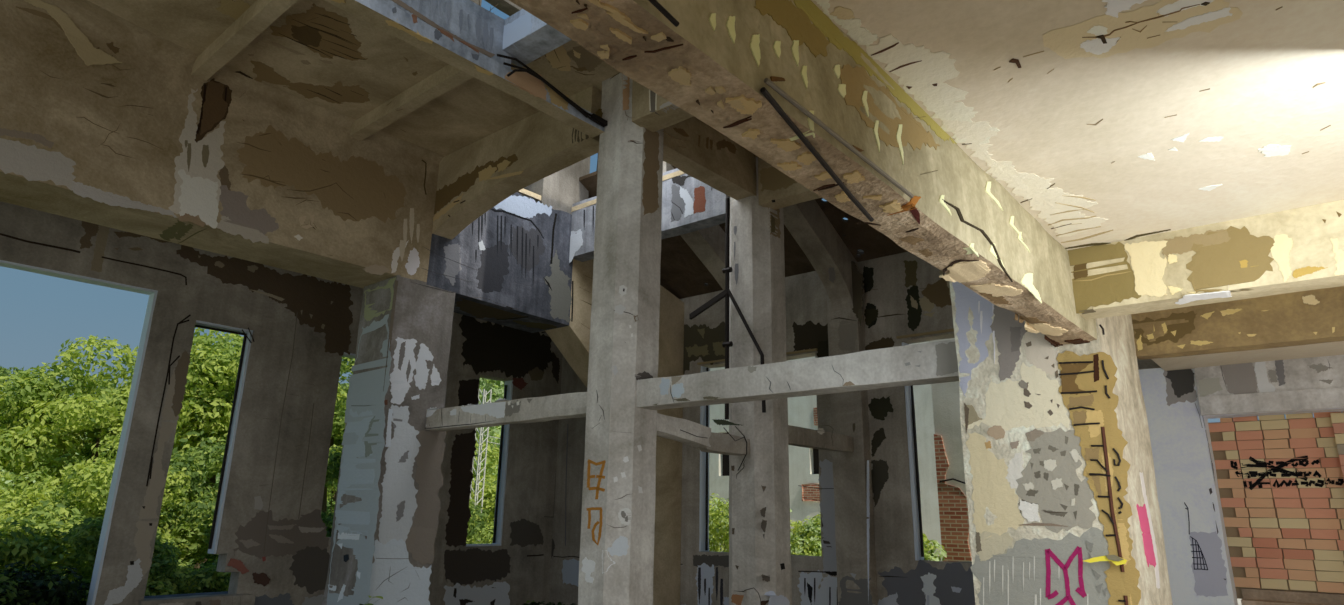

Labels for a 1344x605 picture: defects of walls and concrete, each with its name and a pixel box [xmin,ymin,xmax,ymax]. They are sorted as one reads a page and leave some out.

spalling [250,0,370,104]
spalling [195,78,232,142]
crack [813,182,844,191]
crack [857,220,919,233]
crack [920,170,1013,282]
crack [1020,183,1171,281]
spalling [80,221,353,356]
peeling [910,260,1023,312]
peeling [1124,240,1196,297]
peeling [1136,323,1213,351]
spalling [1165,369,1195,398]
spalling [963,321,1141,605]